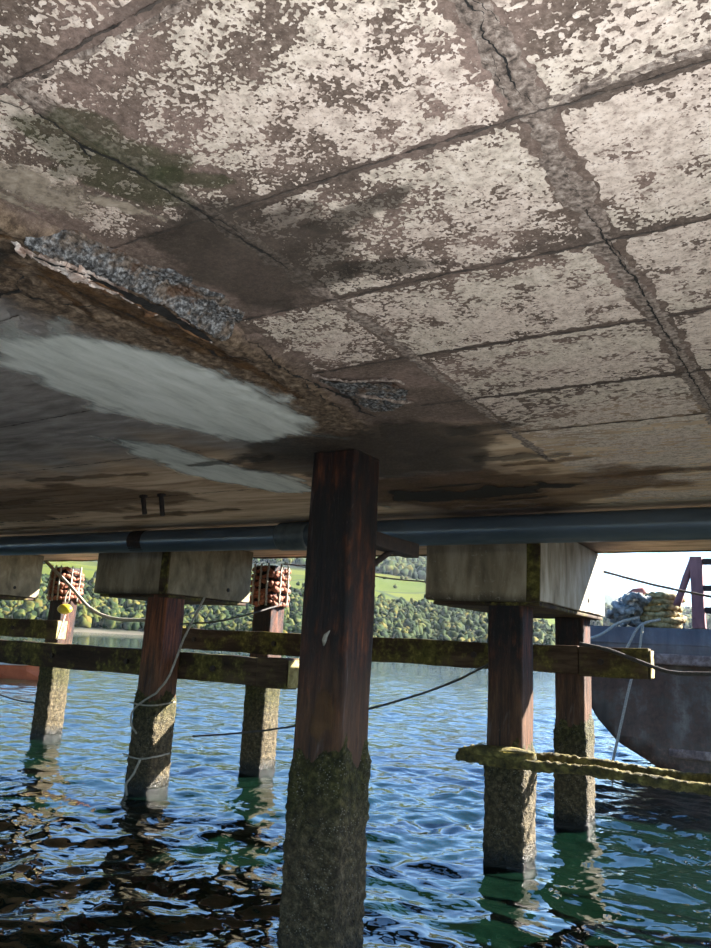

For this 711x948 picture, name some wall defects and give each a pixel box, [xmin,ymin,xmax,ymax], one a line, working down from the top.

crack [464,0,539,109]
peeling [0,0,711,503]
crack [558,161,711,411]
water stain [188,422,570,478]